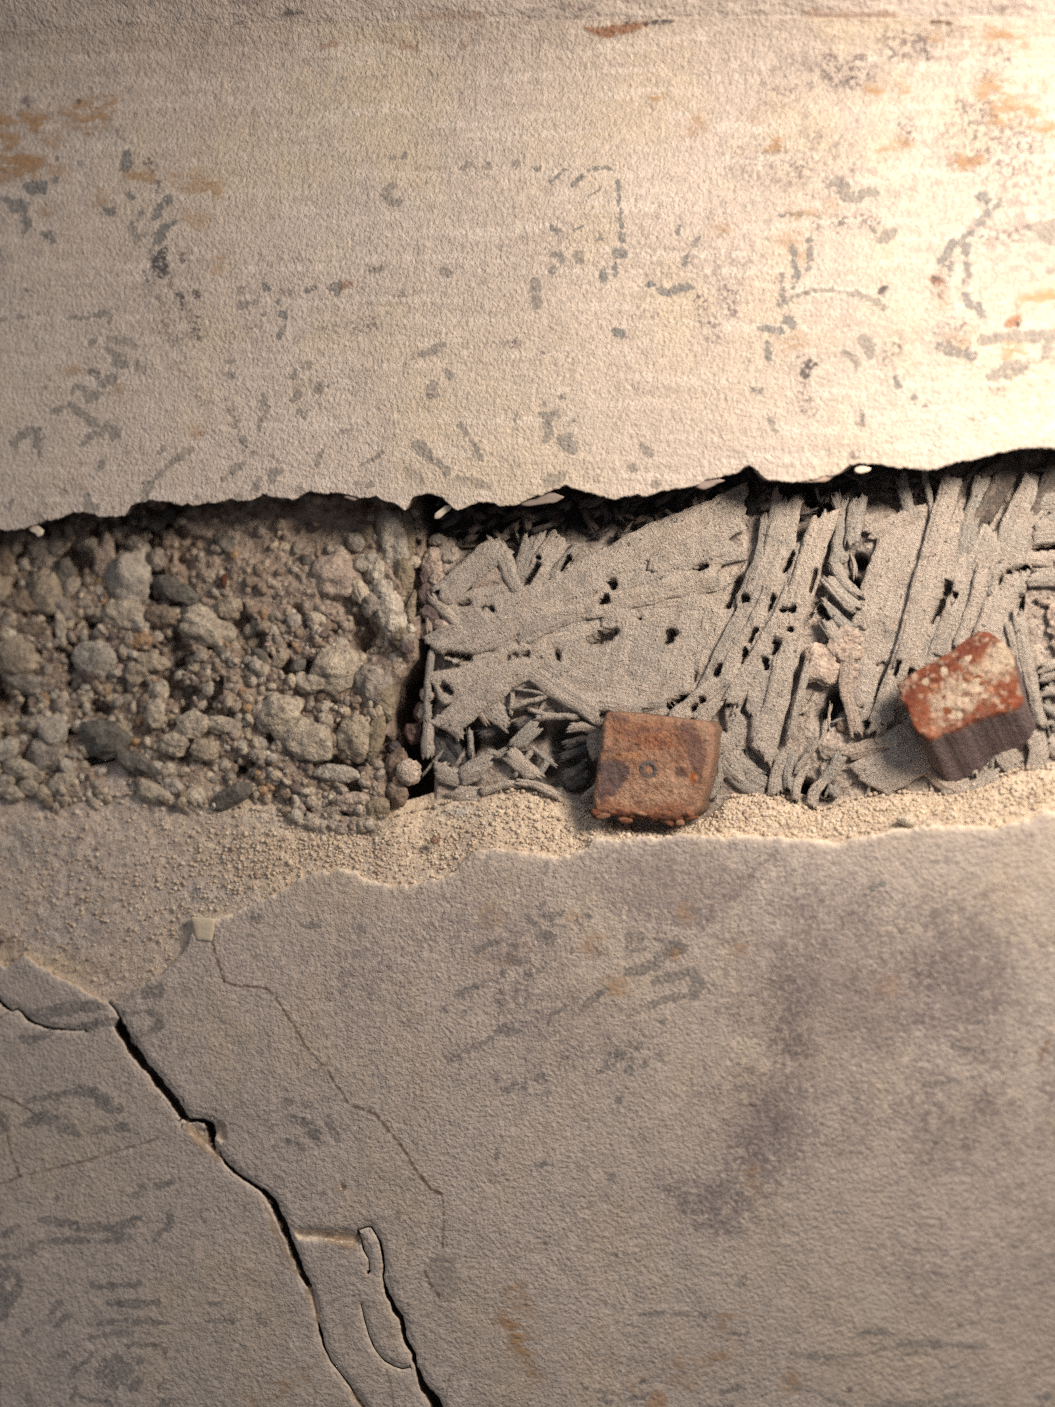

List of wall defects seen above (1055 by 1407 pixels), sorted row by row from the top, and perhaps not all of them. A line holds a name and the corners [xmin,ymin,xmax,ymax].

peeling [227,392,271,453]
peeling [289,368,334,422]
peeling [457,420,484,461]
corrosion [922,655,995,720]
spalling [0,441,1055,1061]
corrosion [590,809,699,826]
crack [212,928,443,1195]
crack [0,998,369,1407]
crack [357,1222,447,1407]